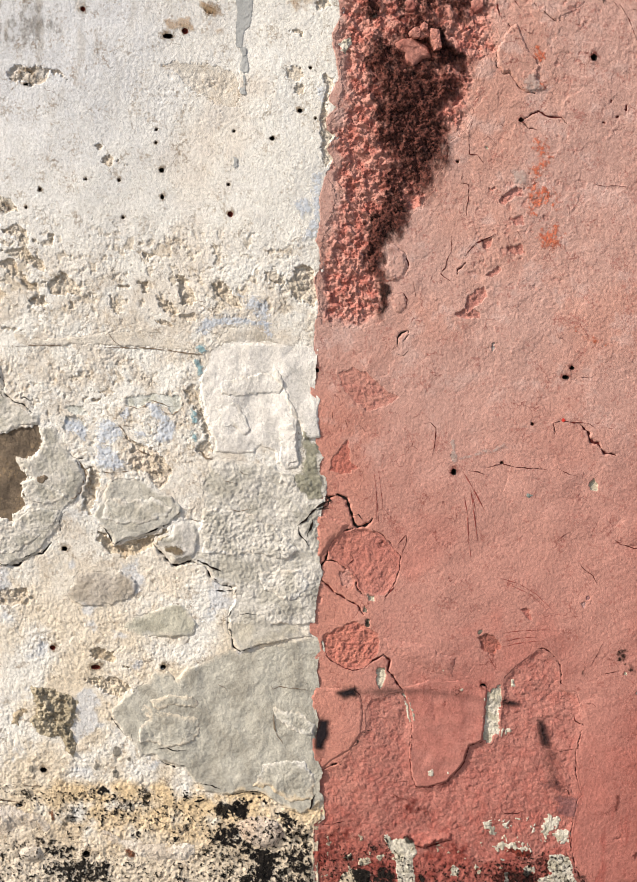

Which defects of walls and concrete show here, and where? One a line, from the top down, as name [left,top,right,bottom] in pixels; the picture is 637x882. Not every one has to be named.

water stain [363,0,472,316]
crack [441,54,566,216]
spalling [0,423,67,554]
spalling [96,528,168,559]
peeling [63,275,272,516]
crack [297,494,407,615]
crack [554,421,616,456]
peeling [138,694,200,748]
spalling [253,528,583,882]
crack [393,722,483,800]
water stain [0,770,585,882]